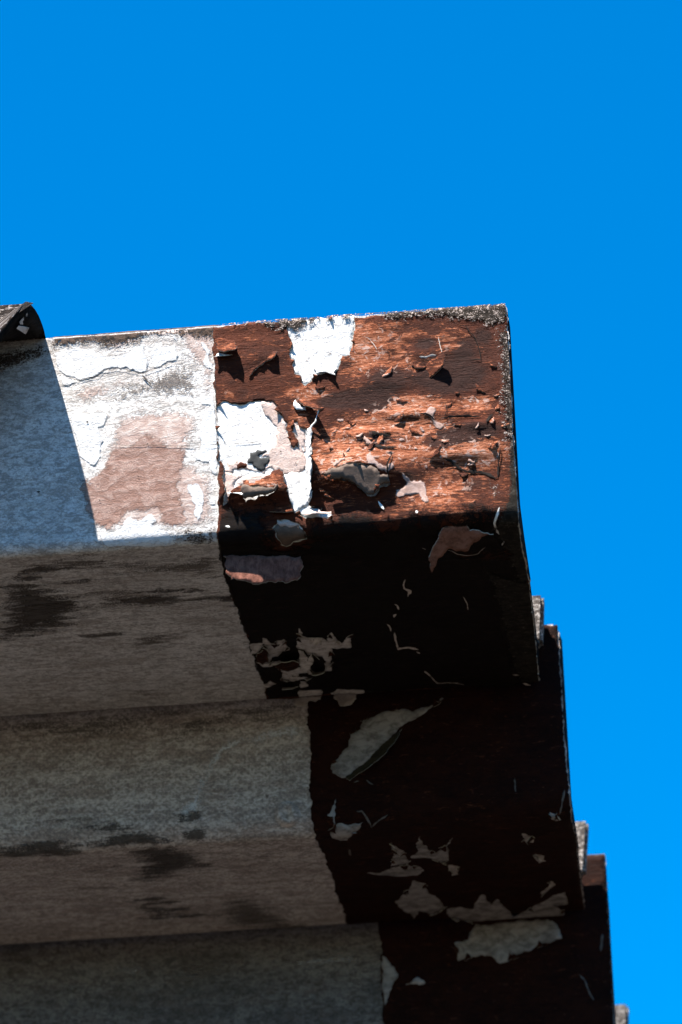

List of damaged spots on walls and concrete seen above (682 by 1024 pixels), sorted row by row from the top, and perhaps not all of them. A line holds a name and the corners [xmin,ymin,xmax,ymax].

crack [62,360,174,384]
peeling [288,315,355,390]
peeling [57,327,333,546]
peeling [328,399,450,459]
peeling [475,384,509,450]
peeling [250,629,364,707]
peeling [330,697,443,780]
peeling [325,799,363,841]
peeling [522,833,546,863]
peeling [369,838,568,963]
peeling [382,956,425,1005]